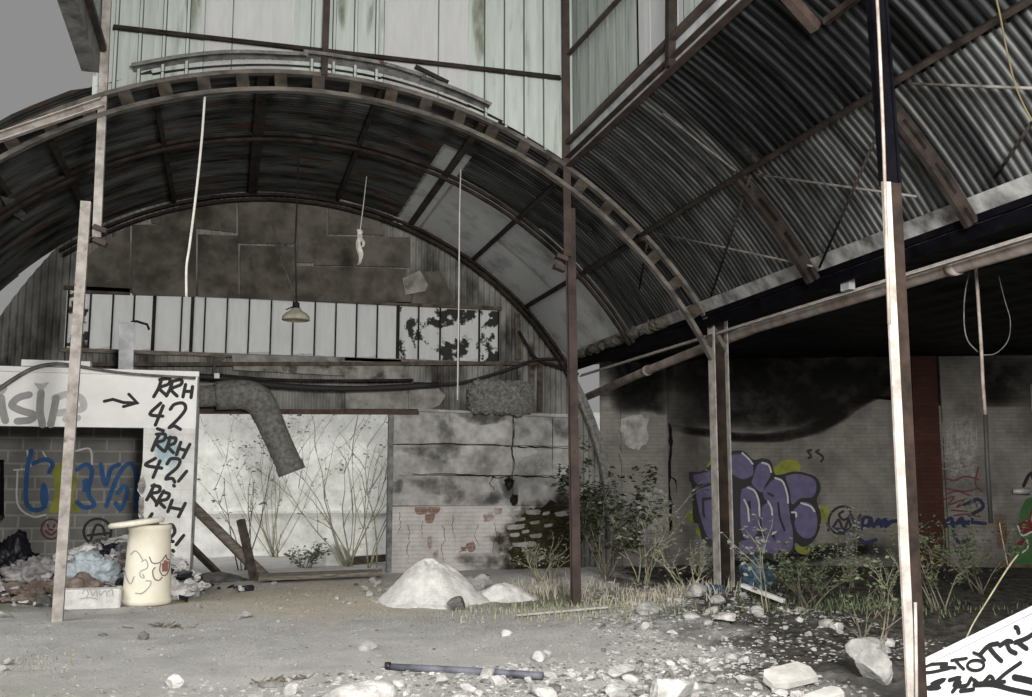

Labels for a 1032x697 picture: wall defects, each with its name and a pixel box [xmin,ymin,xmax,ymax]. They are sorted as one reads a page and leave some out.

damp [613,359,710,436]
damp [729,356,891,442]
damp [953,355,1032,405]
crack [406,416,568,502]
peeling [415,507,440,523]